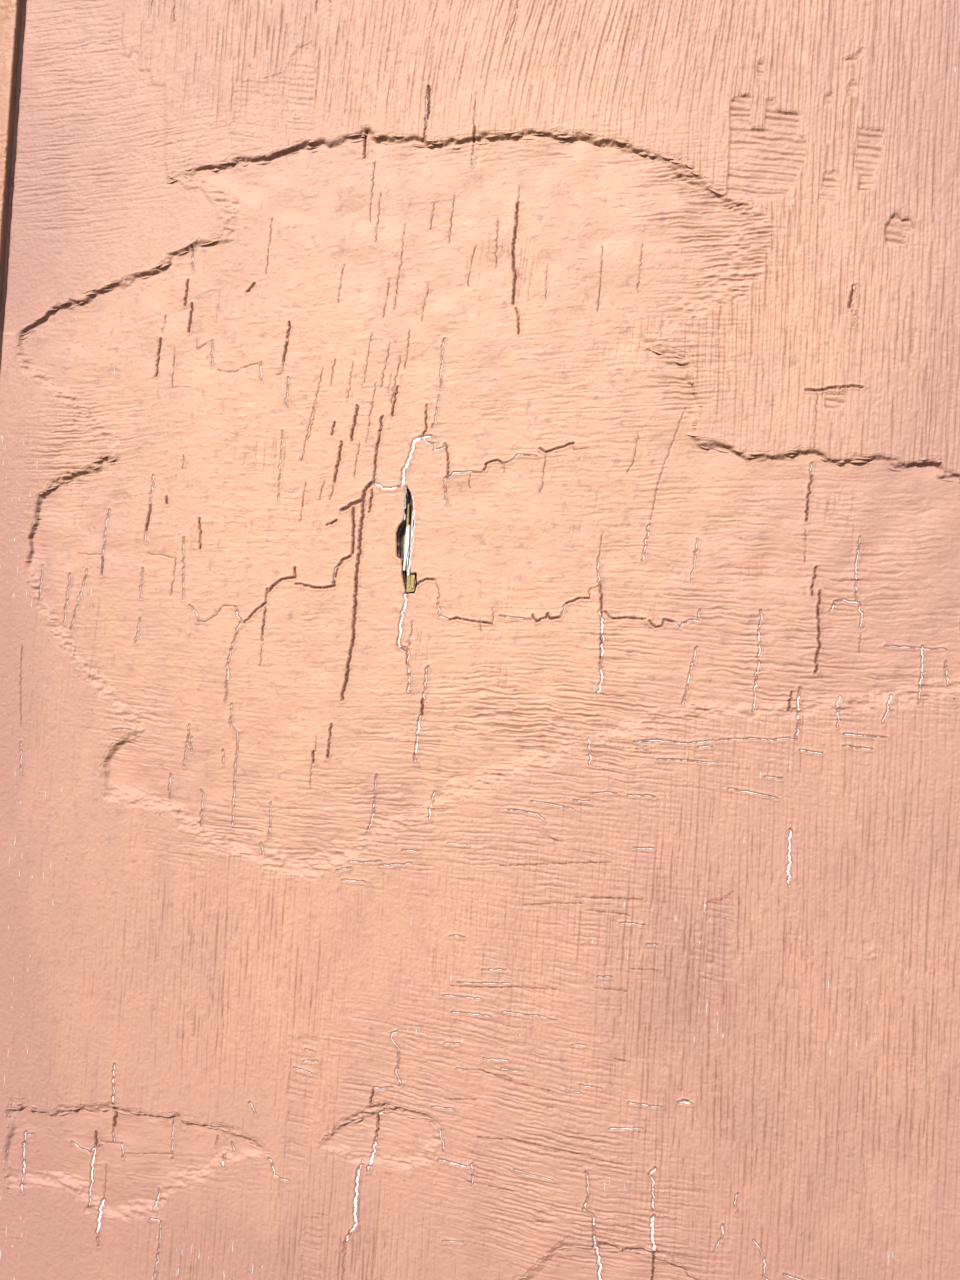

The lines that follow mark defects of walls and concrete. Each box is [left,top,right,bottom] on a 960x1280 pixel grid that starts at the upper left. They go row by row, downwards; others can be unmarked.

crack [627,409,686,560]
crack [636,385,949,798]
crack [785,830,793,884]